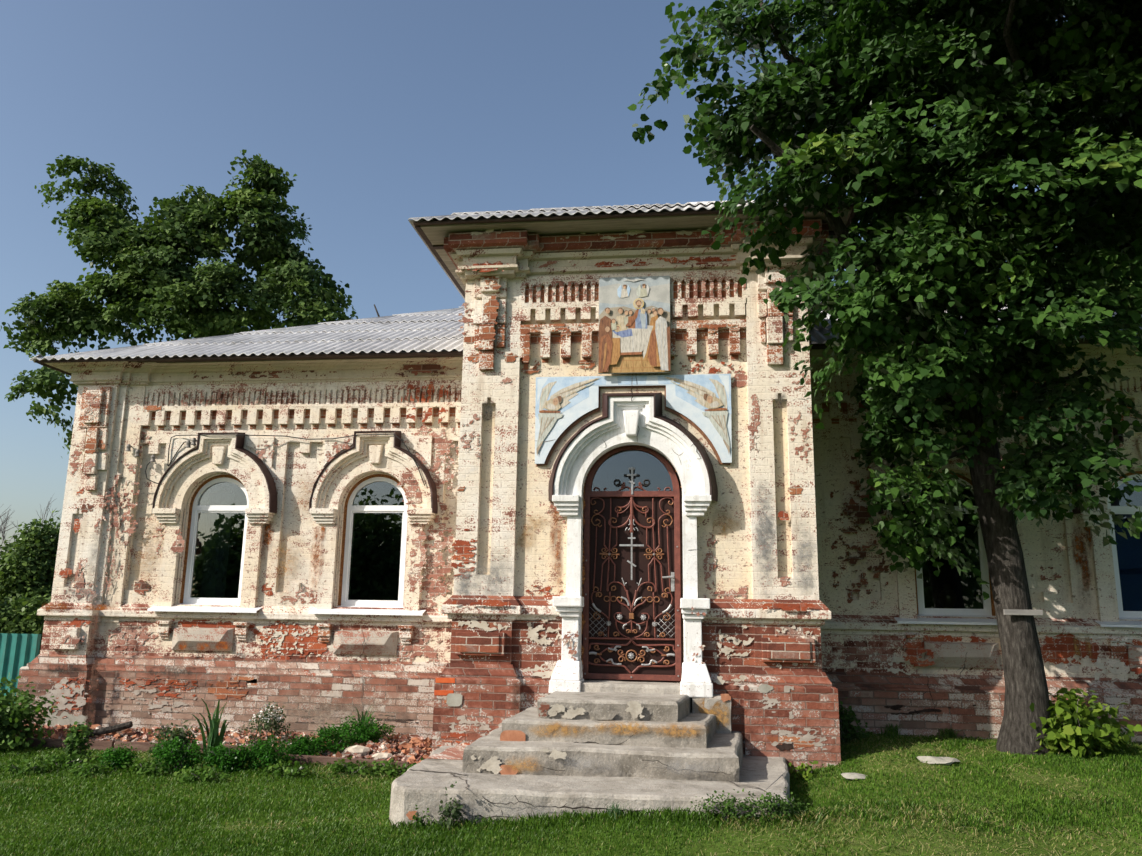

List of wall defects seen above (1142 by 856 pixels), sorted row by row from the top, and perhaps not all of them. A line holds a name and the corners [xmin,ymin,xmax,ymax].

peeling [458,261,509,363]
peeling [500,324,581,384]
peeling [59,364,512,632]
water stain [759,499,772,572]
peeling [825,456,892,608]
peeling [171,619,442,664]
peeling [519,617,579,661]
peeling [692,625,754,664]
peeling [1040,633,1142,681]
spalling [539,701,645,720]
flaking render [428,732,518,775]
crack [409,769,687,819]